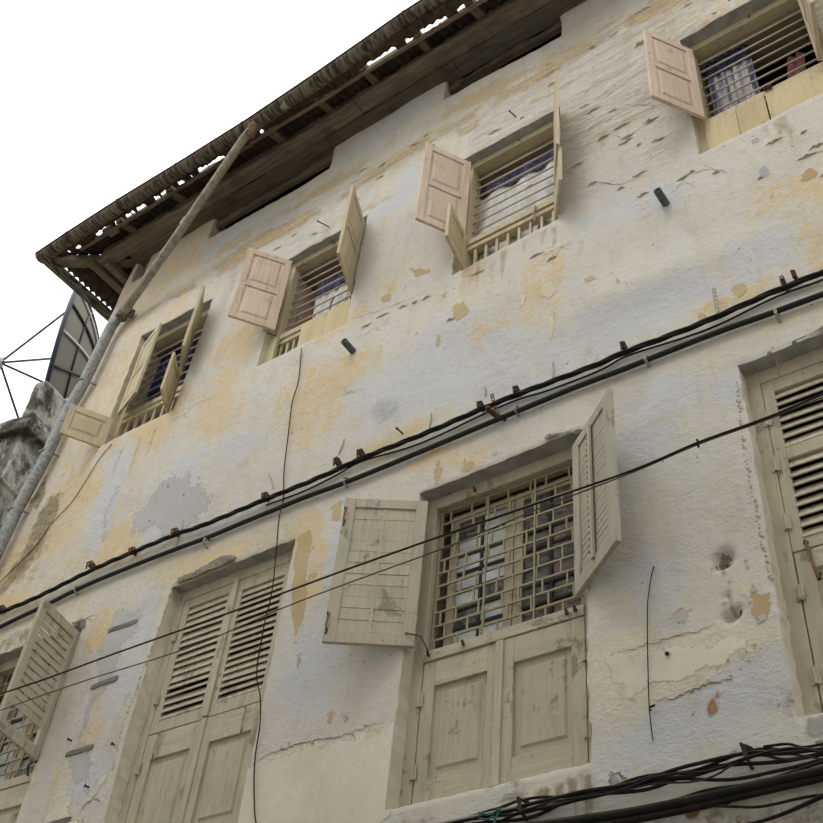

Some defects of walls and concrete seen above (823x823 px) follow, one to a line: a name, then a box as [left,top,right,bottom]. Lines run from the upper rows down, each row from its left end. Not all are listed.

peeling [802,168,823,182]
peeling [447,302,469,321]
leakage [0,478,58,594]
peeling [131,471,213,537]
flaking render [735,382,775,581]
peeling [291,530,317,644]
peeling [710,552,771,624]
peeling [43,608,141,823]
spalling [655,675,732,701]